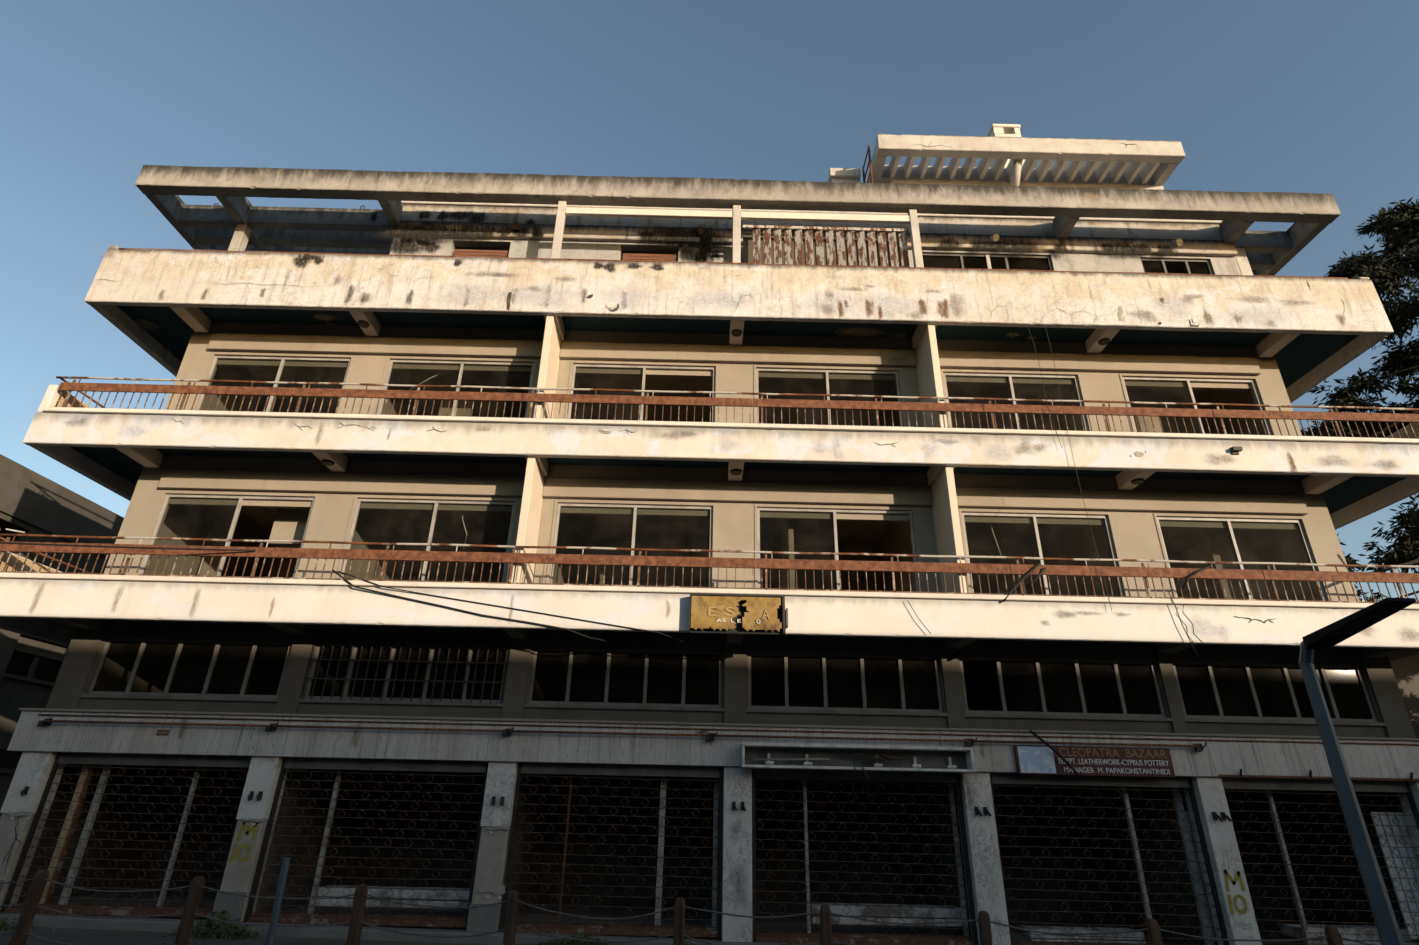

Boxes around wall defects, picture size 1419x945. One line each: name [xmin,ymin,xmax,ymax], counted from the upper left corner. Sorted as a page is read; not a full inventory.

leakage [294,254,323,267]
leakage [371,211,550,254]
leakage [638,226,729,262]
rust [919,300,948,317]